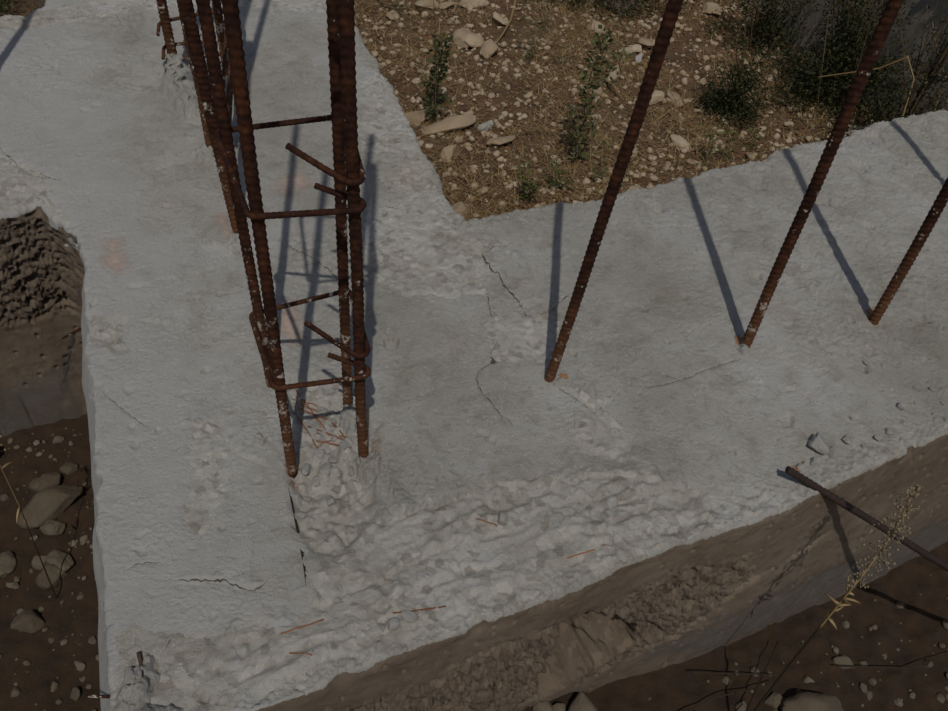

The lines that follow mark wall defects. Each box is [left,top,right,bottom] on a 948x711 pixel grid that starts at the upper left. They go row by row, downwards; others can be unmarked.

crack [482,246,567,322]
crack [123,562,265,591]